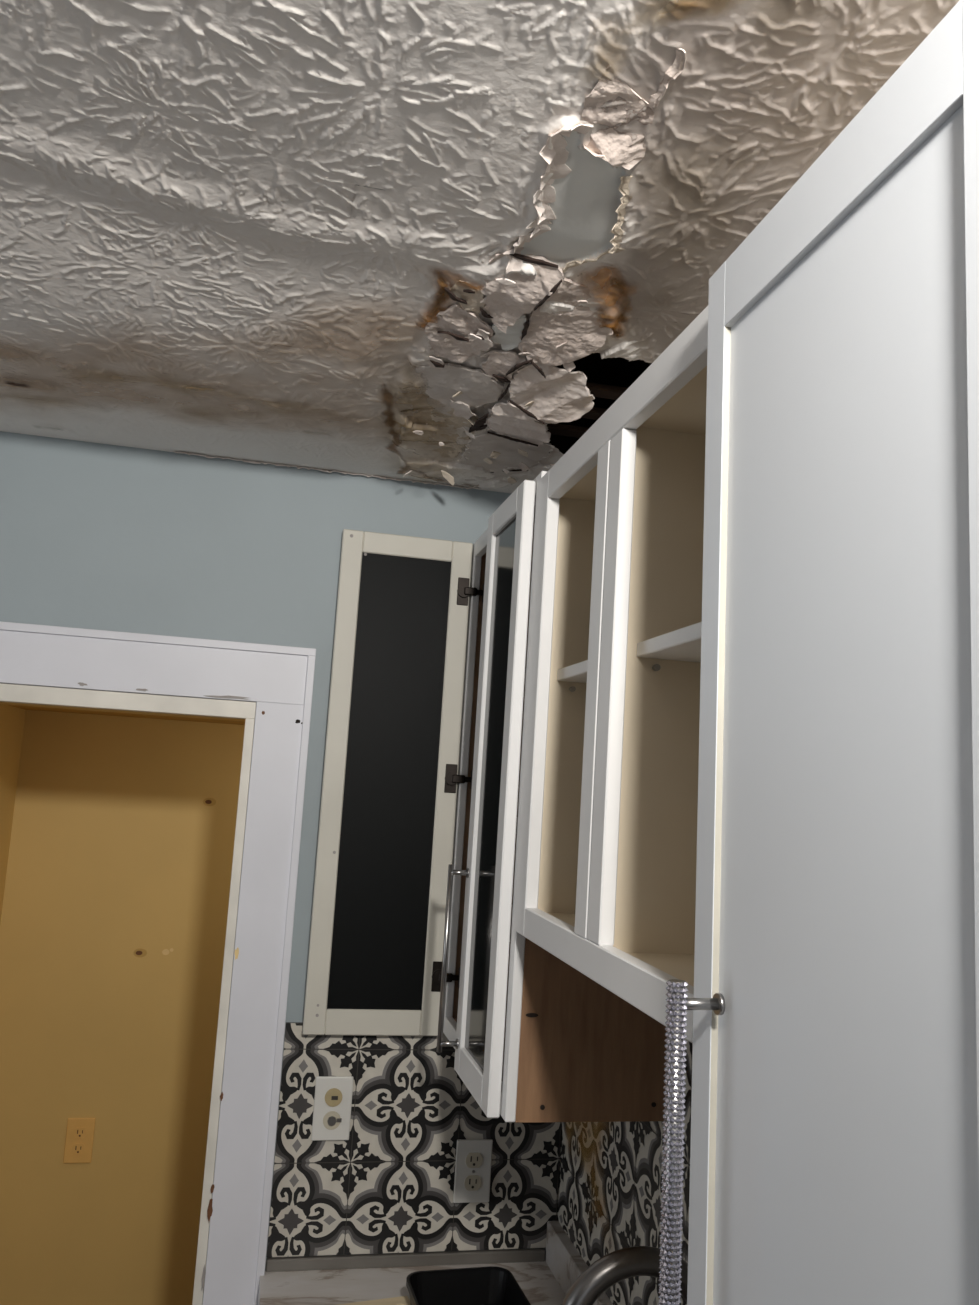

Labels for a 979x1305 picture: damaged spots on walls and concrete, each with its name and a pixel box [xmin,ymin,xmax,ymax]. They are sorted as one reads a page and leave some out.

spalling [174,48,686,489]
crack [430,287,493,368]
crack [469,253,562,473]